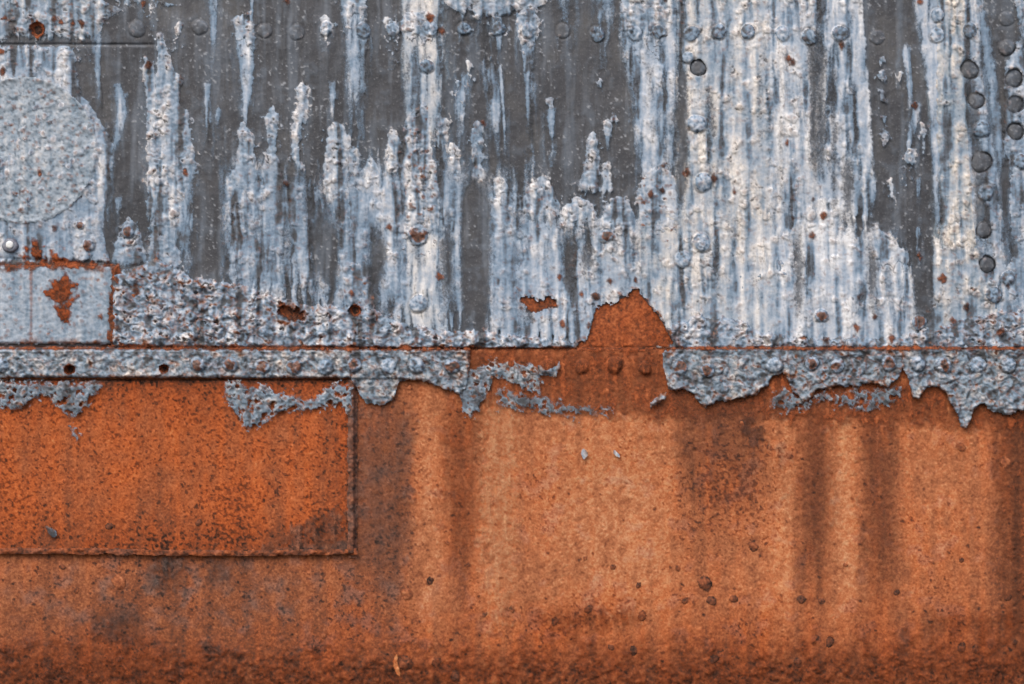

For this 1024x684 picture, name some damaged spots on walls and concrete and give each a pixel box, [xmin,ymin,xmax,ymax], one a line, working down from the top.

peeling [0,0,1024,440]
rust [0,240,1024,586]
rust [393,654,414,676]
rust [697,575,716,605]